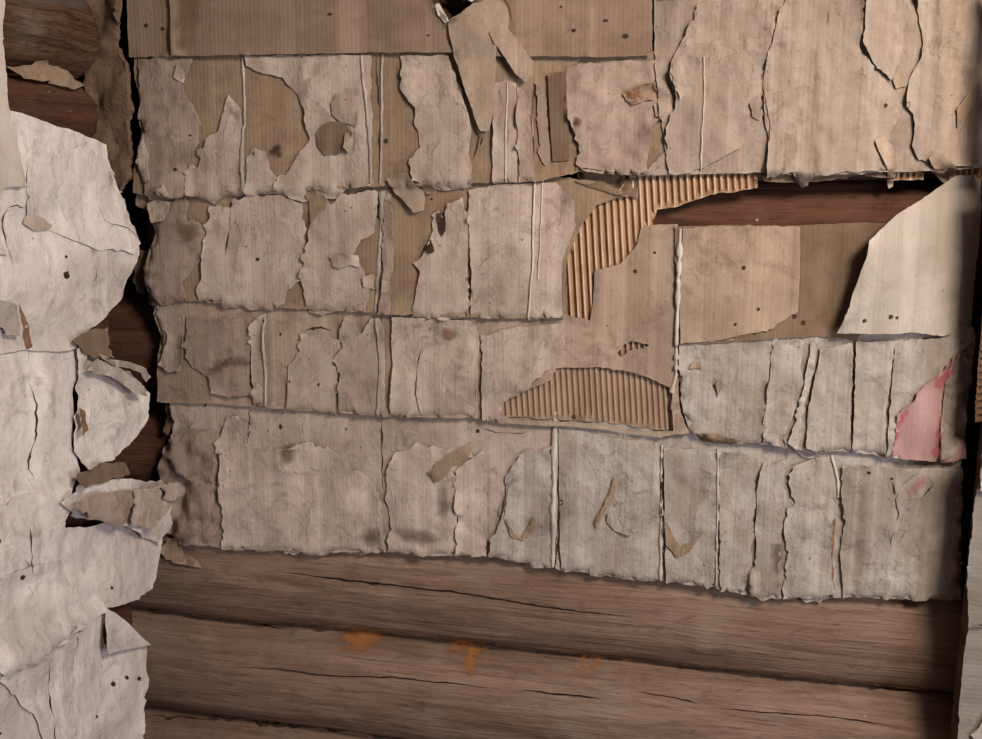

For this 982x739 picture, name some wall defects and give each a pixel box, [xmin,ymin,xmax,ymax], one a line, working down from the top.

crack [3,350,38,475]
crack [829,503,837,590]
crack [275,570,636,618]
crack [48,667,56,739]
crack [240,667,494,689]
crack [526,690,602,699]
crack [645,693,699,704]